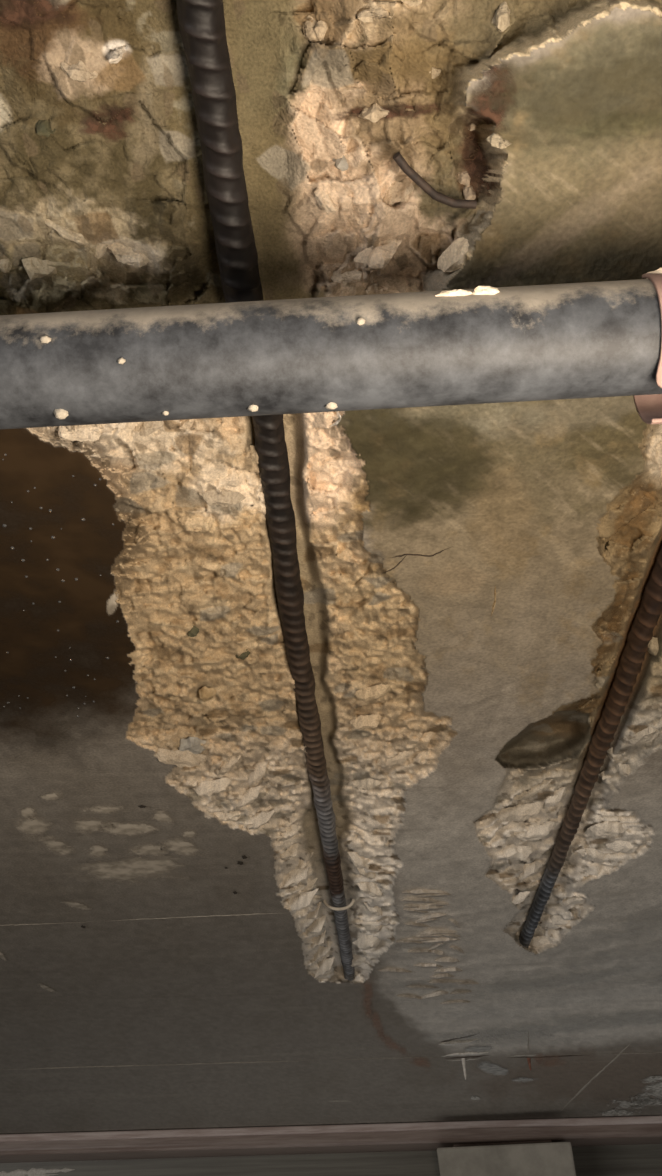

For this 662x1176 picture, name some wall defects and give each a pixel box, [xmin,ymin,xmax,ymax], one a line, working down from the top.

spalling [0,0,662,315]
damp [16,793,71,855]
damp [75,806,199,882]
spalling [26,411,458,984]
spalling [474,424,662,954]